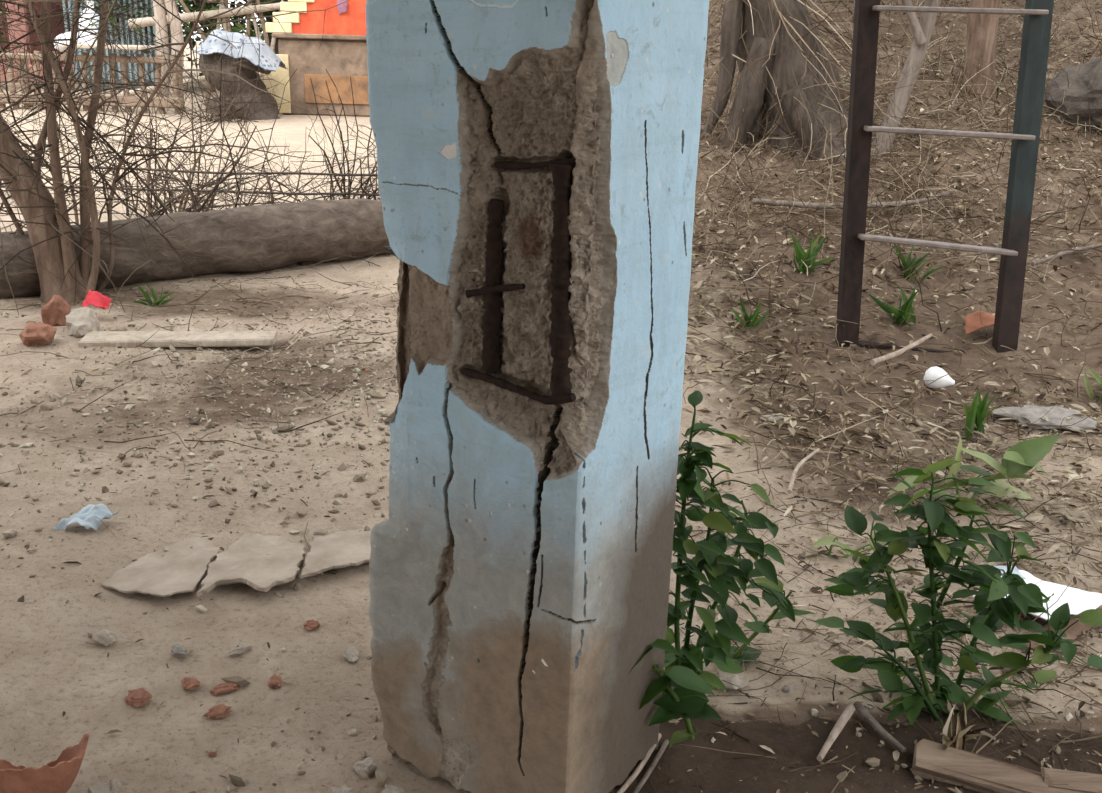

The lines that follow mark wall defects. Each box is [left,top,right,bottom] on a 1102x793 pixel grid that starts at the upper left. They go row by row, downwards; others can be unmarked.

crack [433,1,506,174]
spalling [383,0,630,481]
crack [635,120,654,551]
crack [423,382,455,736]
crack [519,407,596,758]